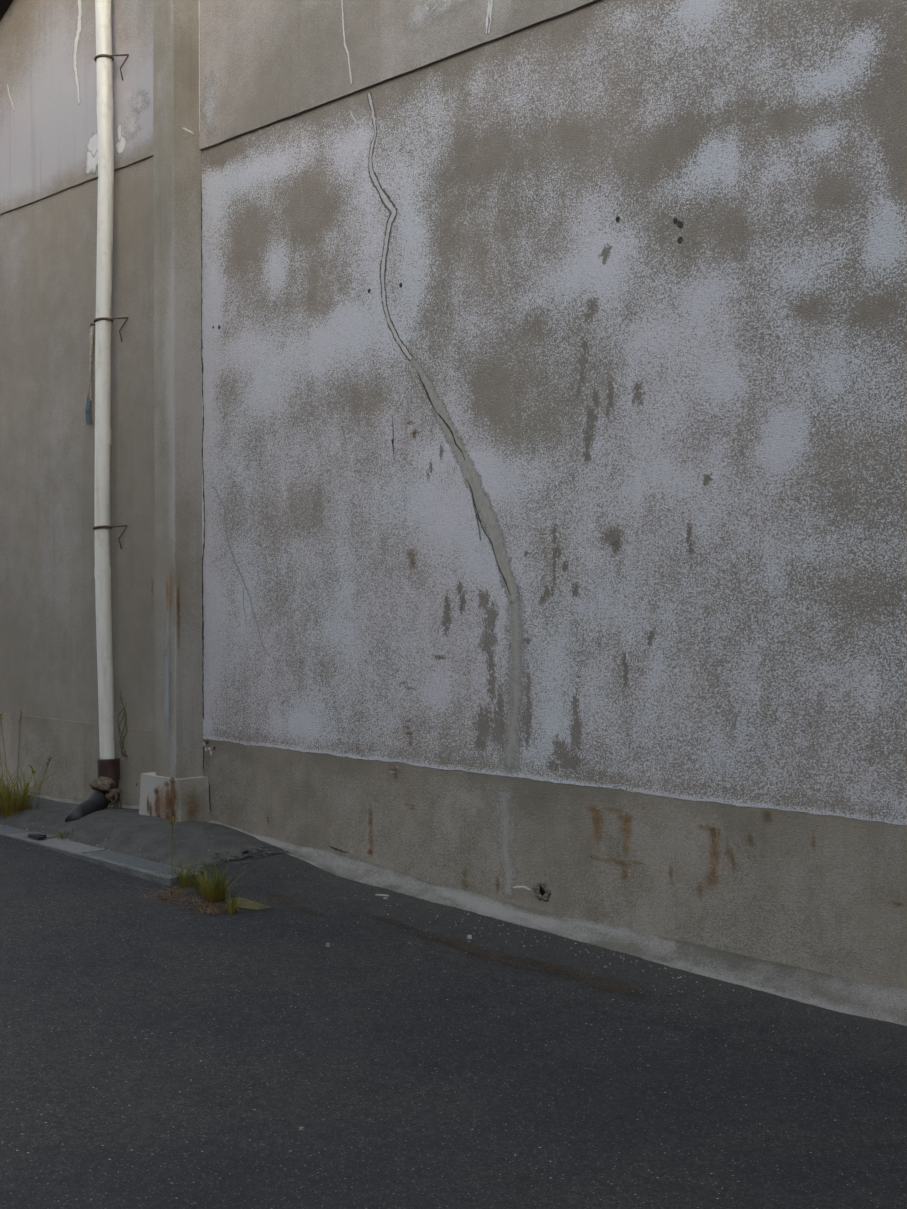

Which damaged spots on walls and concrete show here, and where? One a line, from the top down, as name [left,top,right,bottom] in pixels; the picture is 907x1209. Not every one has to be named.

crack [73,0,82,104]
crack [341,0,525,898]